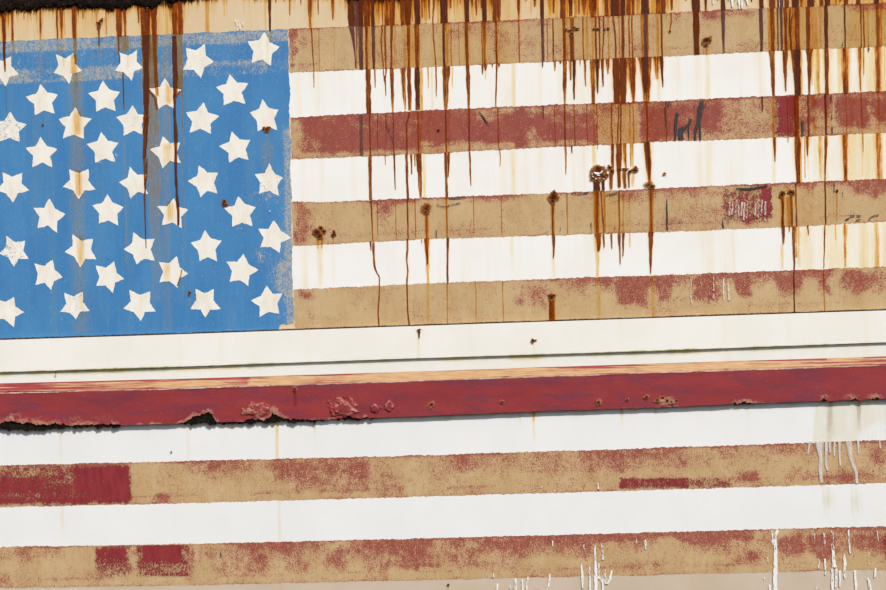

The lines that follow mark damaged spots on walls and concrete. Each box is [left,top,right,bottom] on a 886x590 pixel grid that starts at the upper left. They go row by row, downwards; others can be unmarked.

rust [0,0,200,243]
rust [312,226,336,240]
rust [347,0,501,338]
rust [548,293,556,321]
rust [517,0,673,264]
rust [644,395,679,405]
rust [751,0,865,312]